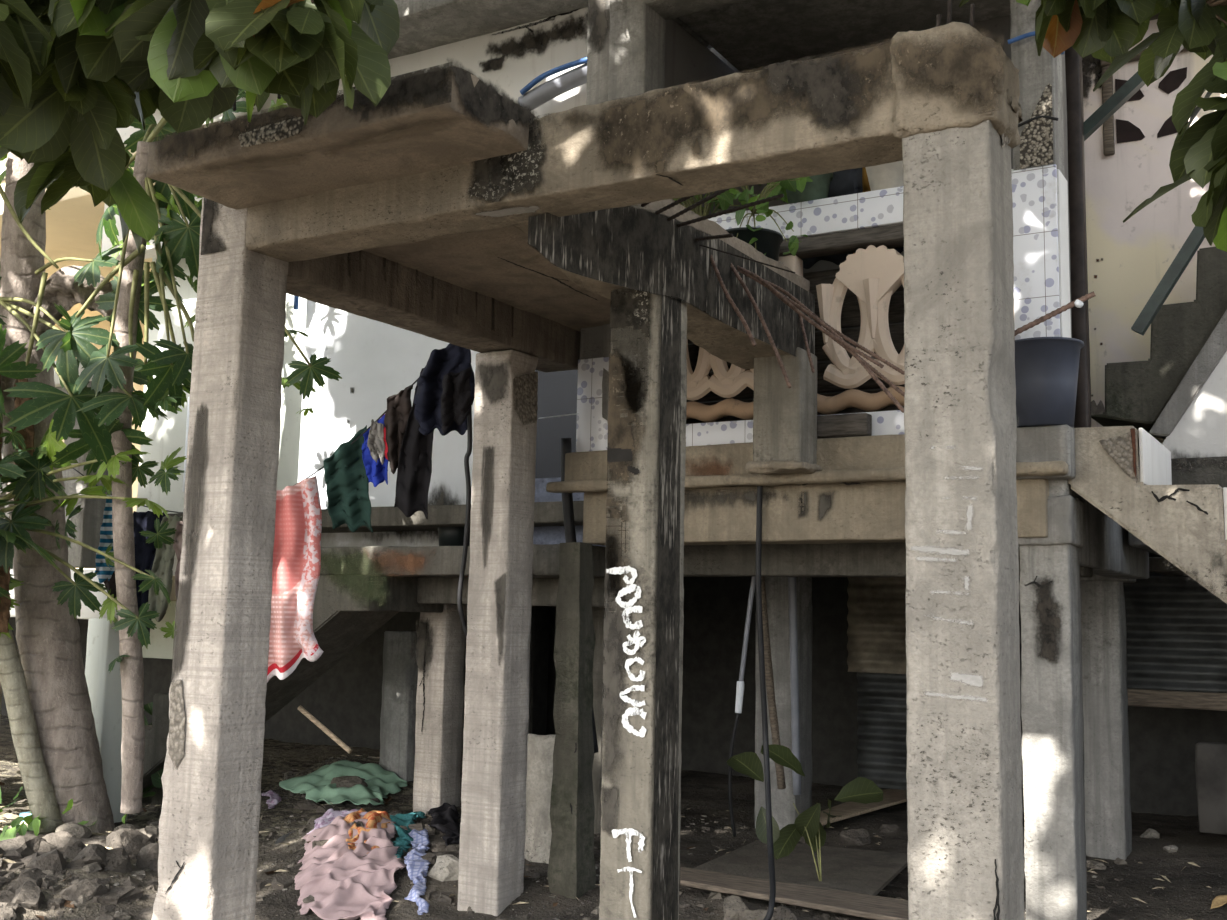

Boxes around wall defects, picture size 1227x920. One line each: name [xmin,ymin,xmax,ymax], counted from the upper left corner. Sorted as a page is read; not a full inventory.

leakage [156,104,312,161]
leakage [564,32,1004,173]
spalling [1002,83,1054,169]
leakage [201,198,226,255]
leakage [321,0,832,920]
leakage [171,404,207,682]
leakage [911,546,968,562]
leakage [945,497,976,534]
crack [1151,488,1208,515]
leakage [1035,577,1061,663]
leakage [926,673,986,701]
crack [992,859,1000,920]